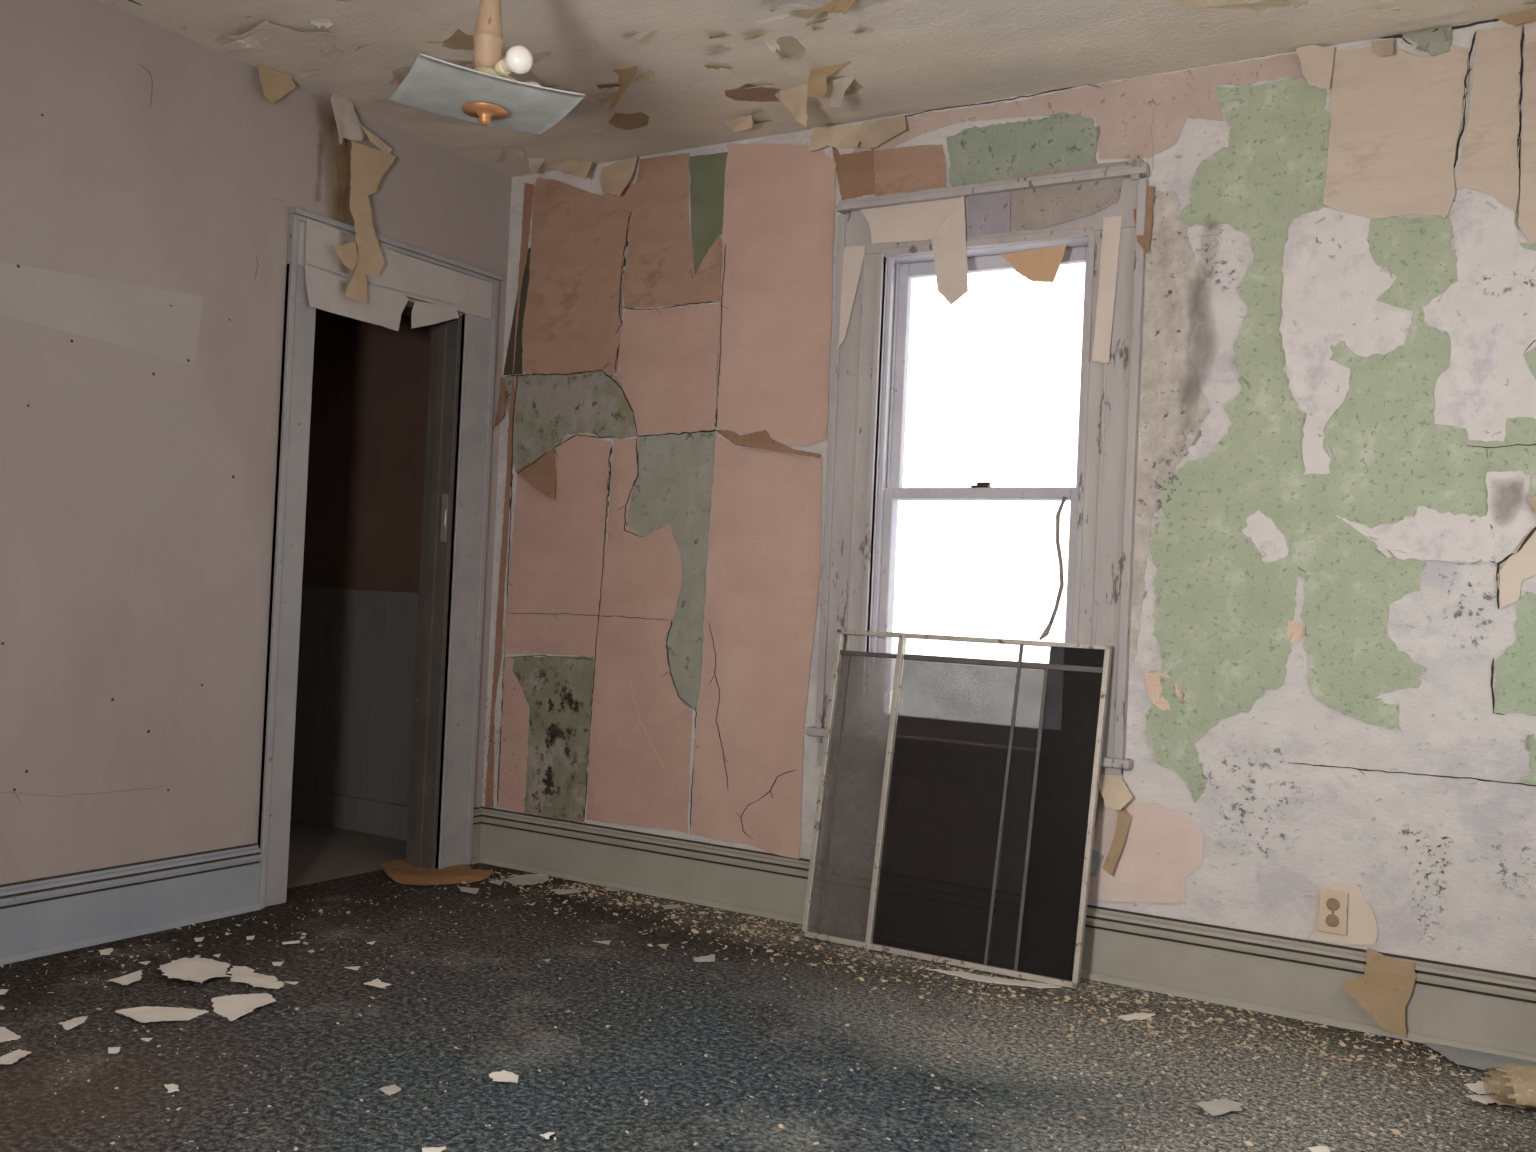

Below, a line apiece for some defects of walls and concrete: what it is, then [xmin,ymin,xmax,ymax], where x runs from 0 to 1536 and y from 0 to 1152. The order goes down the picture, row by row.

peeling [220,16,370,104]
peeling [372,29,479,126]
peeling [502,51,655,134]
peeling [703,0,907,152]
peeling [946,112,1100,187]
peeling [1161,0,1477,57]
crack [1380,19,1524,169]
peeling [690,152,729,279]
peeling [503,247,716,710]
peeling [1129,45,1536,802]
leakage [483,671,579,800]
peeling [511,655,594,822]